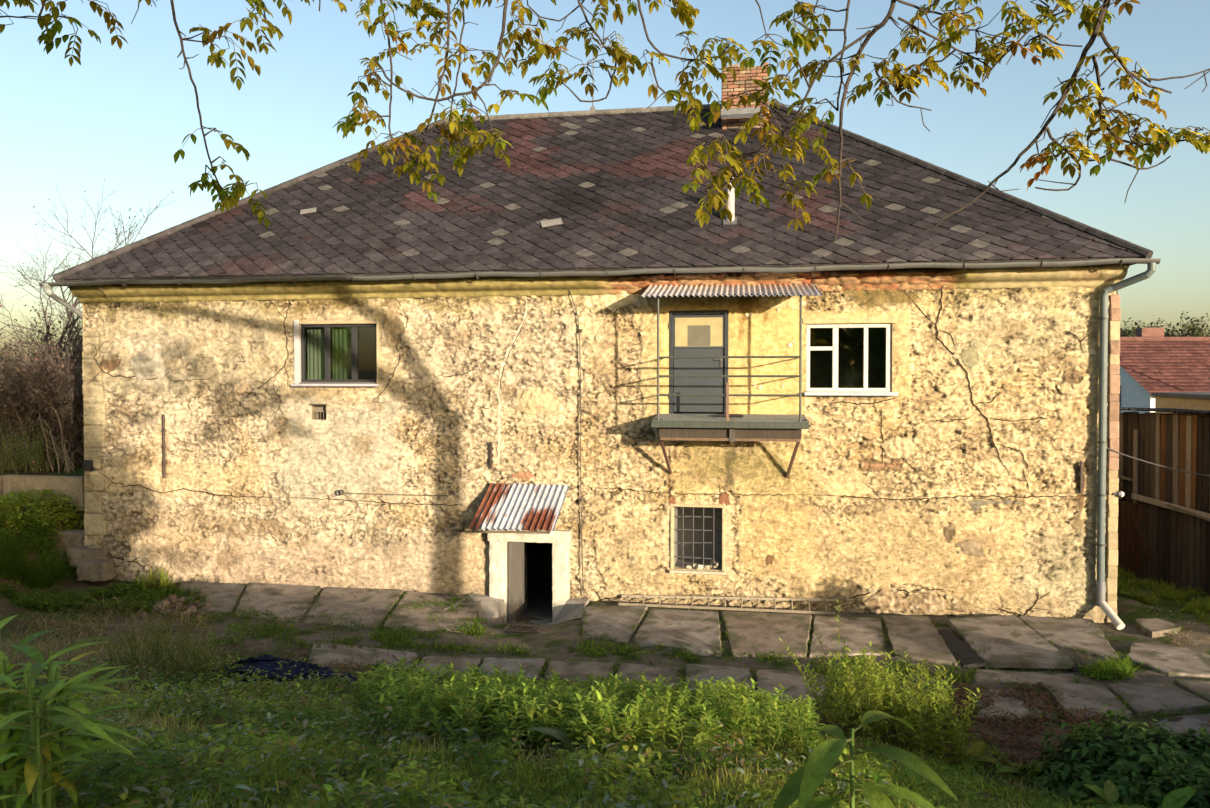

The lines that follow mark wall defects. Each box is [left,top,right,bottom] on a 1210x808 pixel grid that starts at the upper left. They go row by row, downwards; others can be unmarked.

crack [93,467,470,506]
crack [582,285,1076,501]